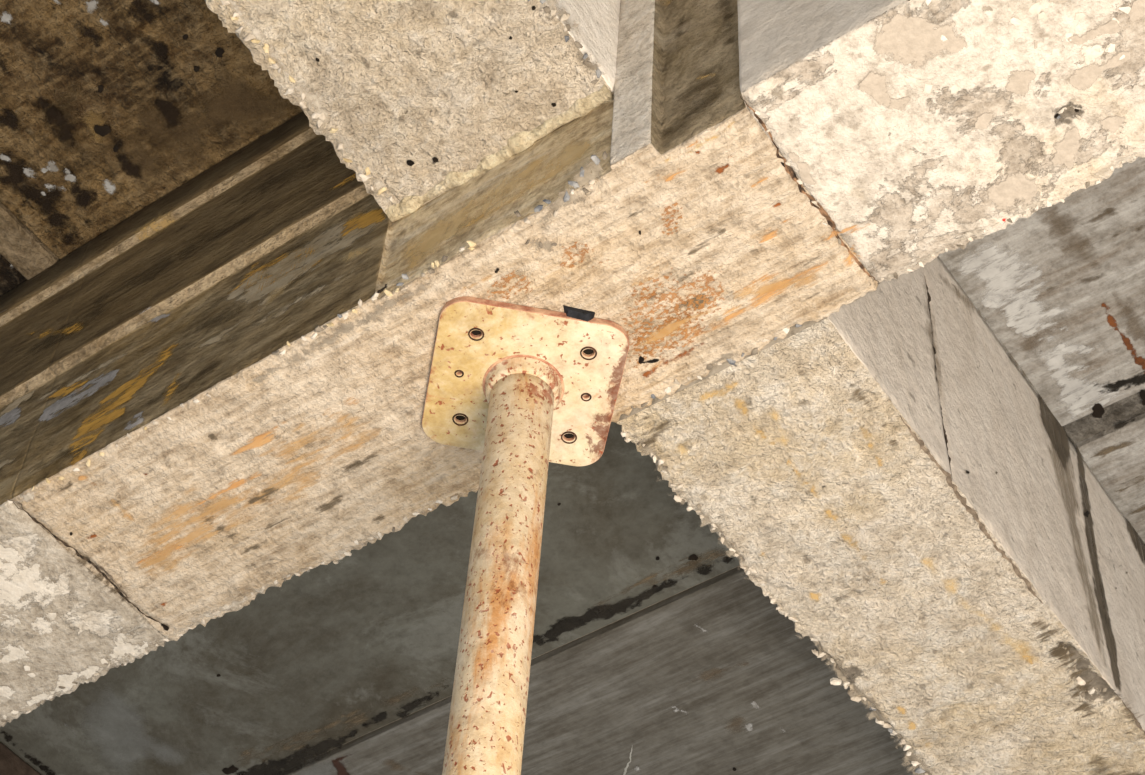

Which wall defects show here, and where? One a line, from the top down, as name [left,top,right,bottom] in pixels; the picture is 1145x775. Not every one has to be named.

water stain [76,1,108,47]
water stain [128,0,168,62]
peeling [1010,0,1145,91]
peeling [1051,102,1083,169]
water stain [0,153,116,244]
crack [740,96,877,281]
corrosion [560,242,609,268]
corrosion [620,261,826,377]
corrosion [1101,303,1145,370]
crack [900,279,1043,604]
crack [6,499,169,631]
peeling [0,495,458,722]